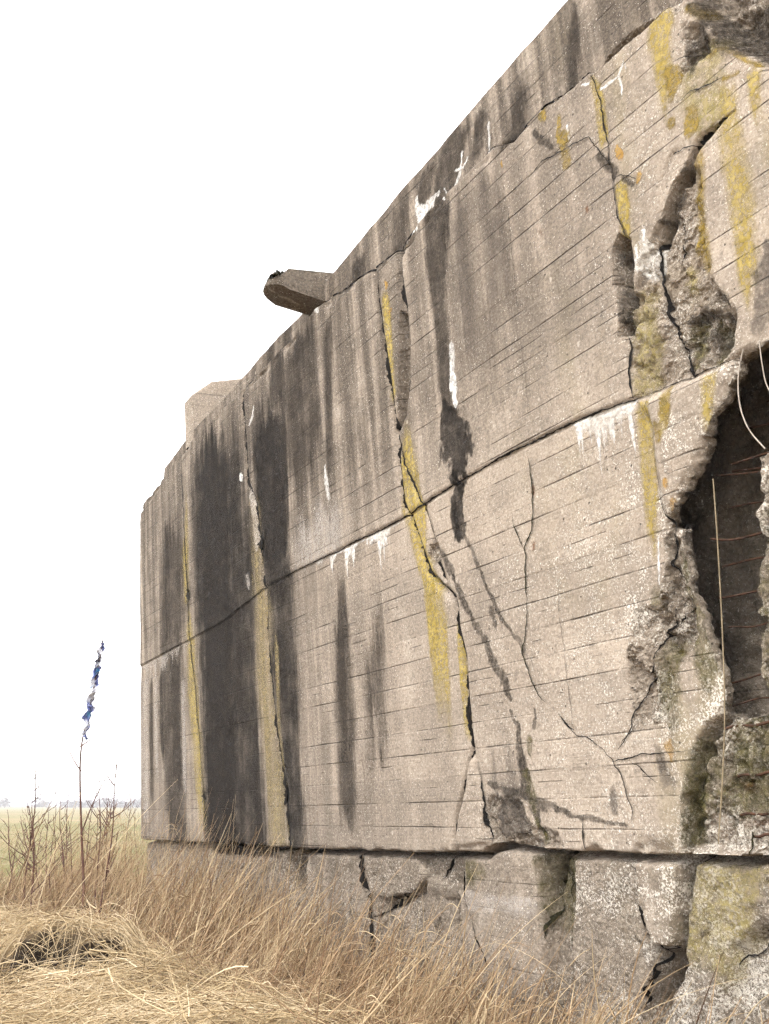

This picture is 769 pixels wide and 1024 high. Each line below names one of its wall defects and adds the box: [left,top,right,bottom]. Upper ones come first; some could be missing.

spalling [610,108,740,402]
crack [181,447,205,821]
damp [149,308,332,857]
crack [242,380,318,900]
damp [335,586,355,830]
damp [316,523,399,573]
crack [324,226,494,984]
damp [439,546,479,628]
damp [482,638,626,840]
damp [573,400,638,470]
crack [512,453,741,1024]
spalling [625,526,701,730]